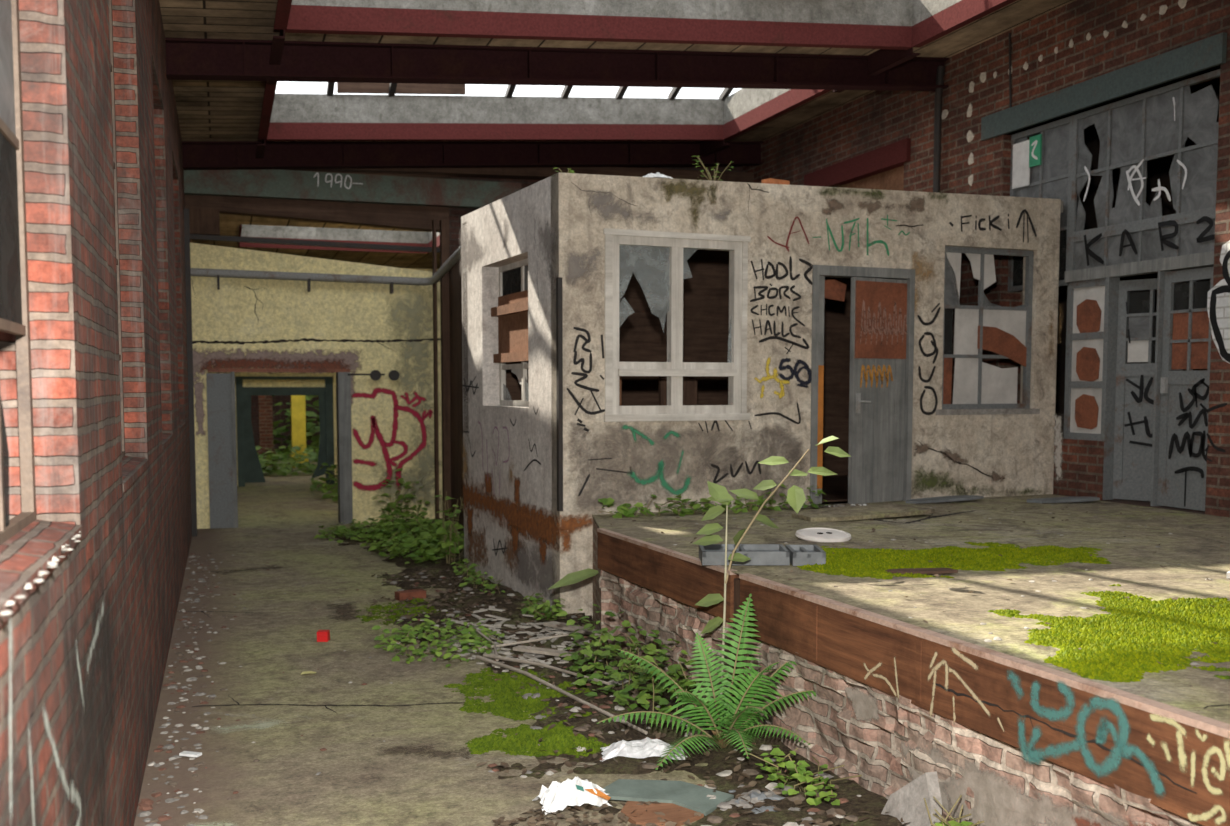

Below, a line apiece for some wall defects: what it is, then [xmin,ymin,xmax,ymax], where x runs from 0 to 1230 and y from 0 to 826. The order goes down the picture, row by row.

leakage [592,192,653,219]
leakage [662,180,729,226]
leakage [541,224,600,291]
crack [914,440,1005,479]
crack [869,511,973,524]